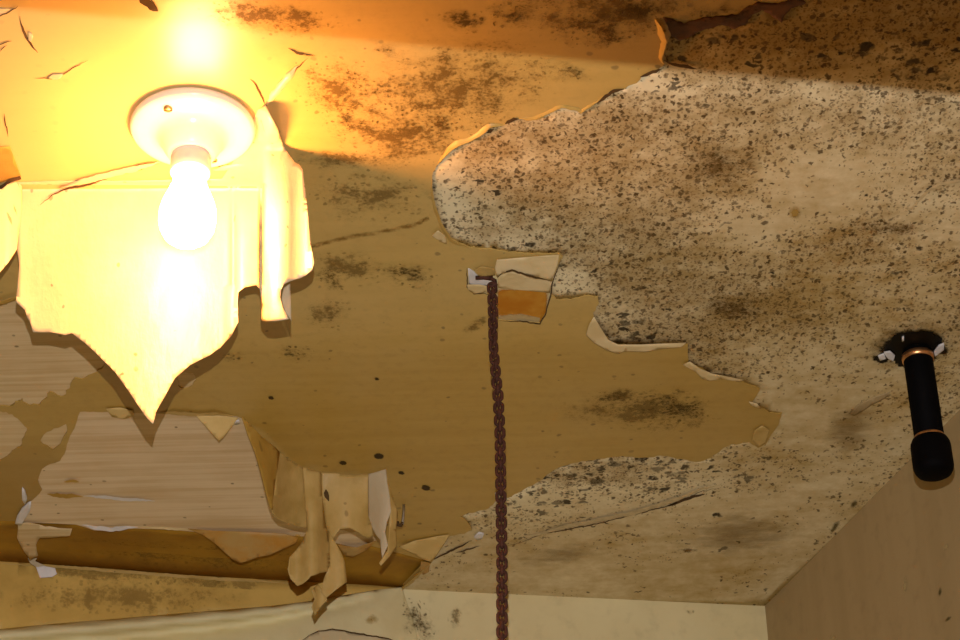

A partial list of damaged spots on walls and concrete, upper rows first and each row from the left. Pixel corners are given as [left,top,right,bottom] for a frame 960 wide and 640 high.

crack [40,161,159,205]
peeling [0,105,503,615]
mould [307,49,517,158]
flaking render [431,0,960,606]